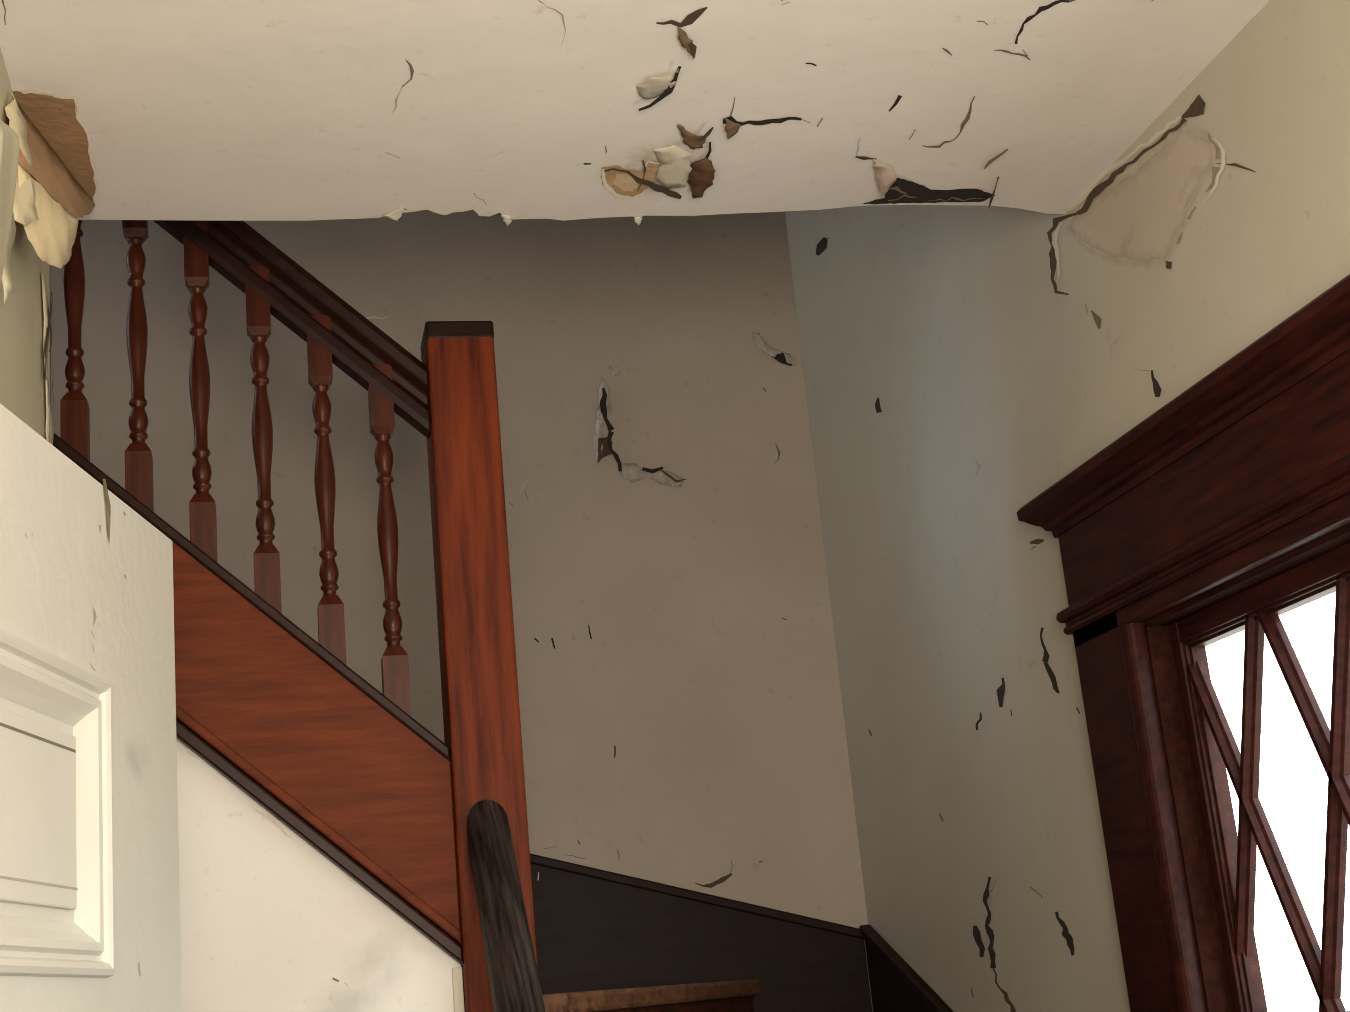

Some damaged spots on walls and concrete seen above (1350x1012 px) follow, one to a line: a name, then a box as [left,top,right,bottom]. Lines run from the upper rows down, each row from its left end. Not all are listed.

crack [538,0,566,42]
peeling [637,7,707,111]
crack [977,0,1075,60]
peeling [584,97,823,201]
spalling [855,96,1008,208]
spalling [593,366,686,487]
crack [970,877,1016,1012]